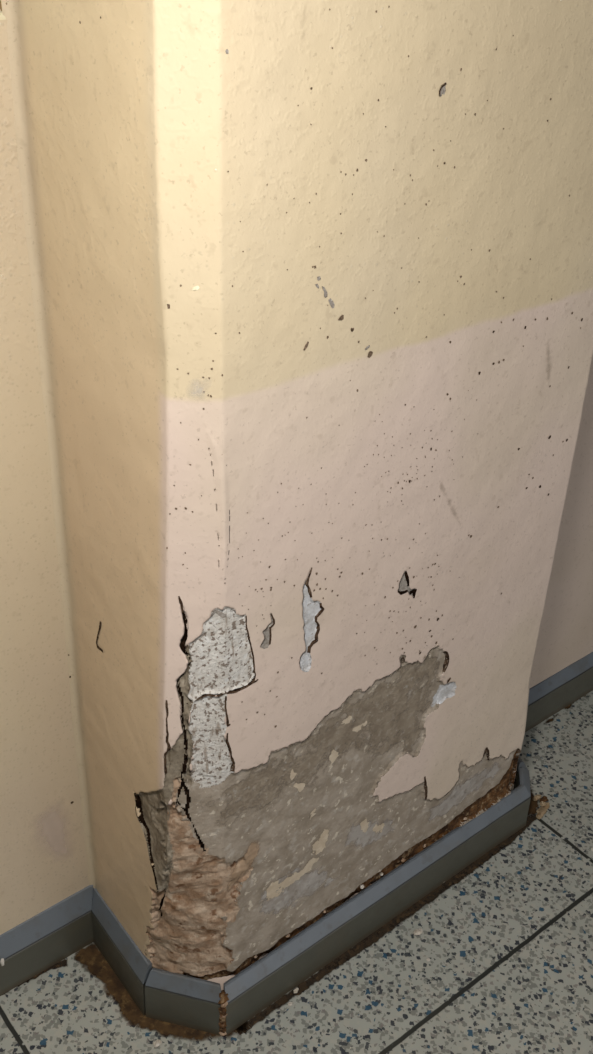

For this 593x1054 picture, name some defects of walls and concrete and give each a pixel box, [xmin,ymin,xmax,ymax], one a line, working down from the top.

peeling [300,568,324,672]
peeling [398,571,417,598]
crack [175,596,258,856]
spalling [136,607,521,977]
crack [134,793,166,916]